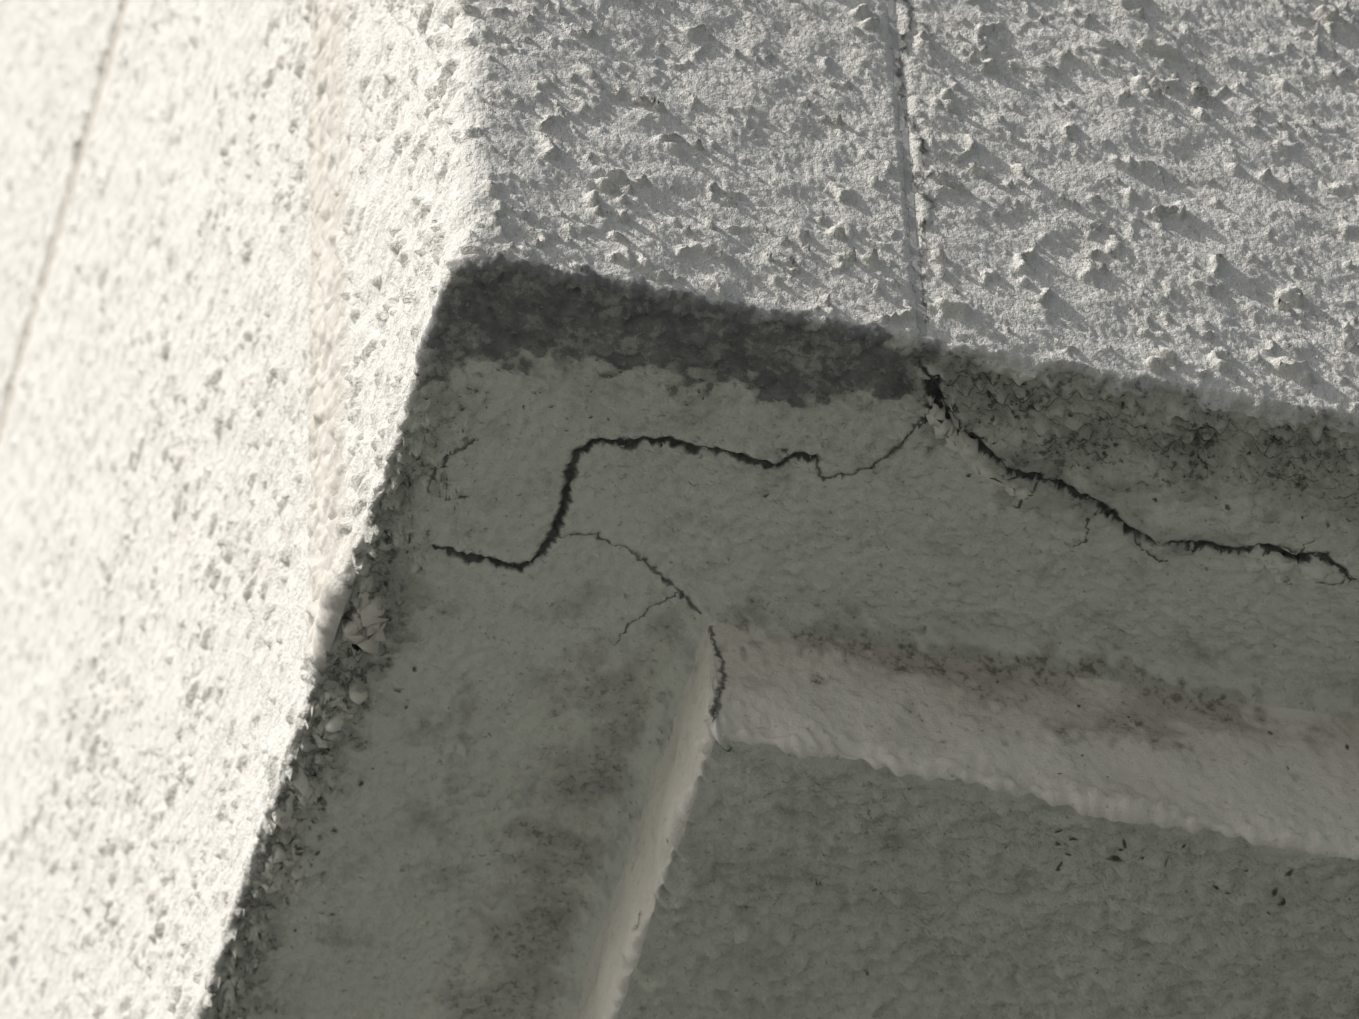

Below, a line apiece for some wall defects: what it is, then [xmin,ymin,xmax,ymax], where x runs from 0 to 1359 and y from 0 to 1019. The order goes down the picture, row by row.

crack [896,0,943,323]
leakage [347,453,439,594]
leakage [414,252,1353,502]
crack [427,357,1356,723]
leakage [224,615,406,990]
leakage [204,977,250,1019]